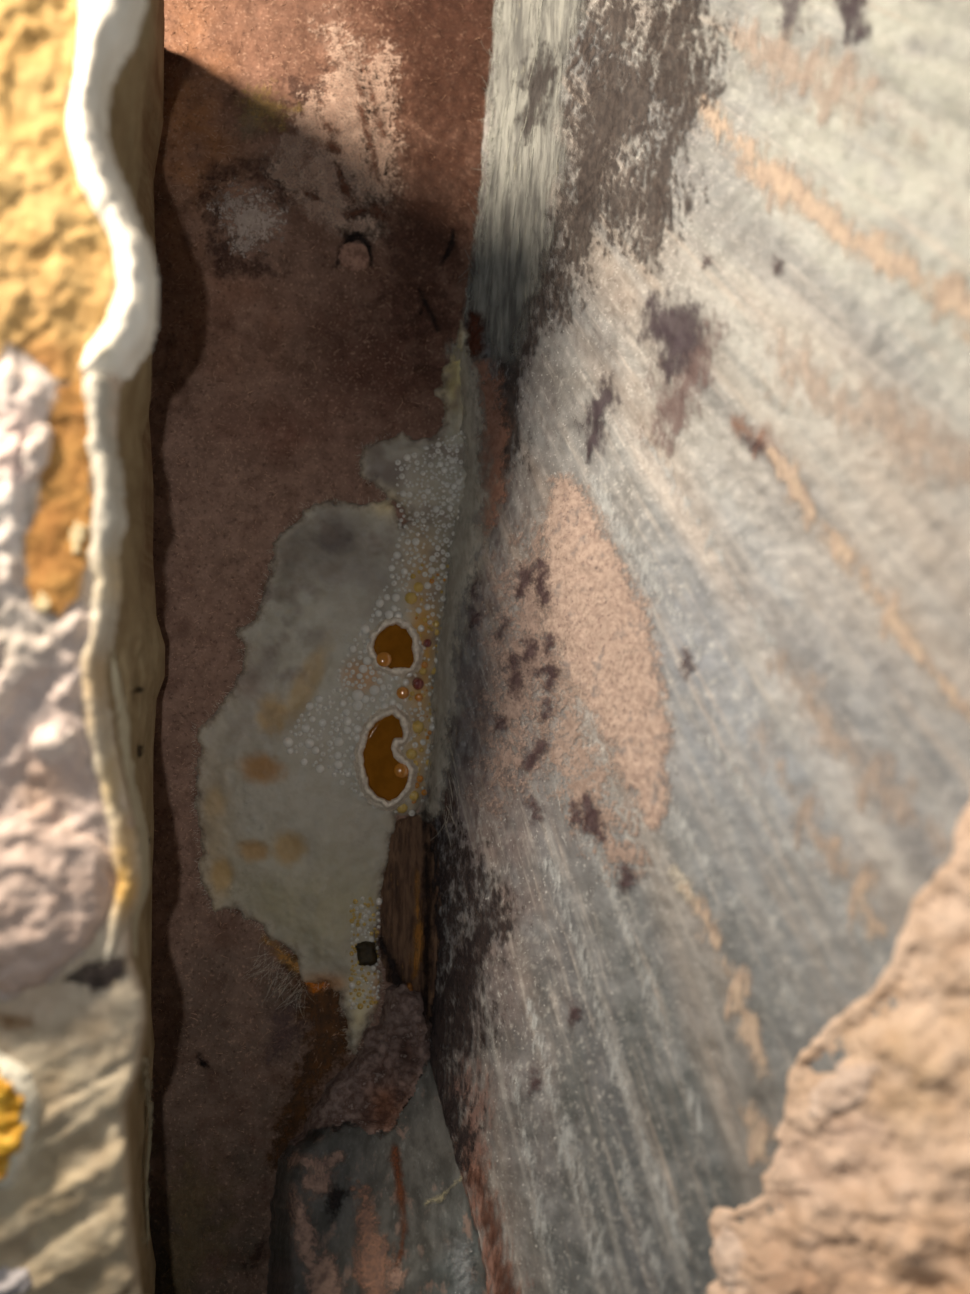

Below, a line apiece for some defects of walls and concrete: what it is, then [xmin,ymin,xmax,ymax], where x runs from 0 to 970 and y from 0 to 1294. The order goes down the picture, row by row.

damp [488,0,970,483]
peeling [0,0,159,964]
damp [515,558,550,605]
damp [507,633,558,719]
damp [522,739,547,770]
damp [570,793,606,842]
damp [603,863,634,895]
damp [637,291,722,522]
corrosion [263,937,352,1172]
spalling [707,804,970,1294]